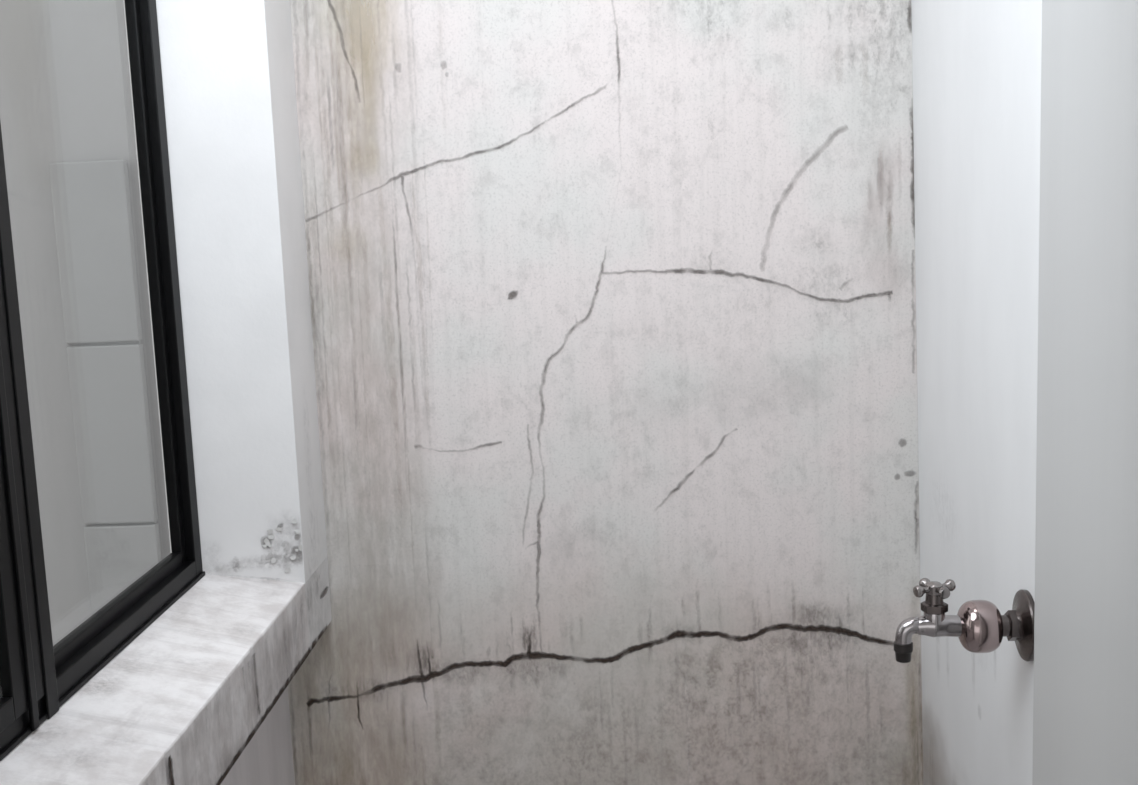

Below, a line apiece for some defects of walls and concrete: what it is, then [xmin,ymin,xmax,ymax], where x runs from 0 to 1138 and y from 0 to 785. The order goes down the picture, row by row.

crack [398,126,538,186]
crack [654,269,775,283]
crack [805,291,892,302]
crack [541,263,603,413]
crack [535,501,543,602]
crack [217,624,893,785]
crack [167,755,175,785]